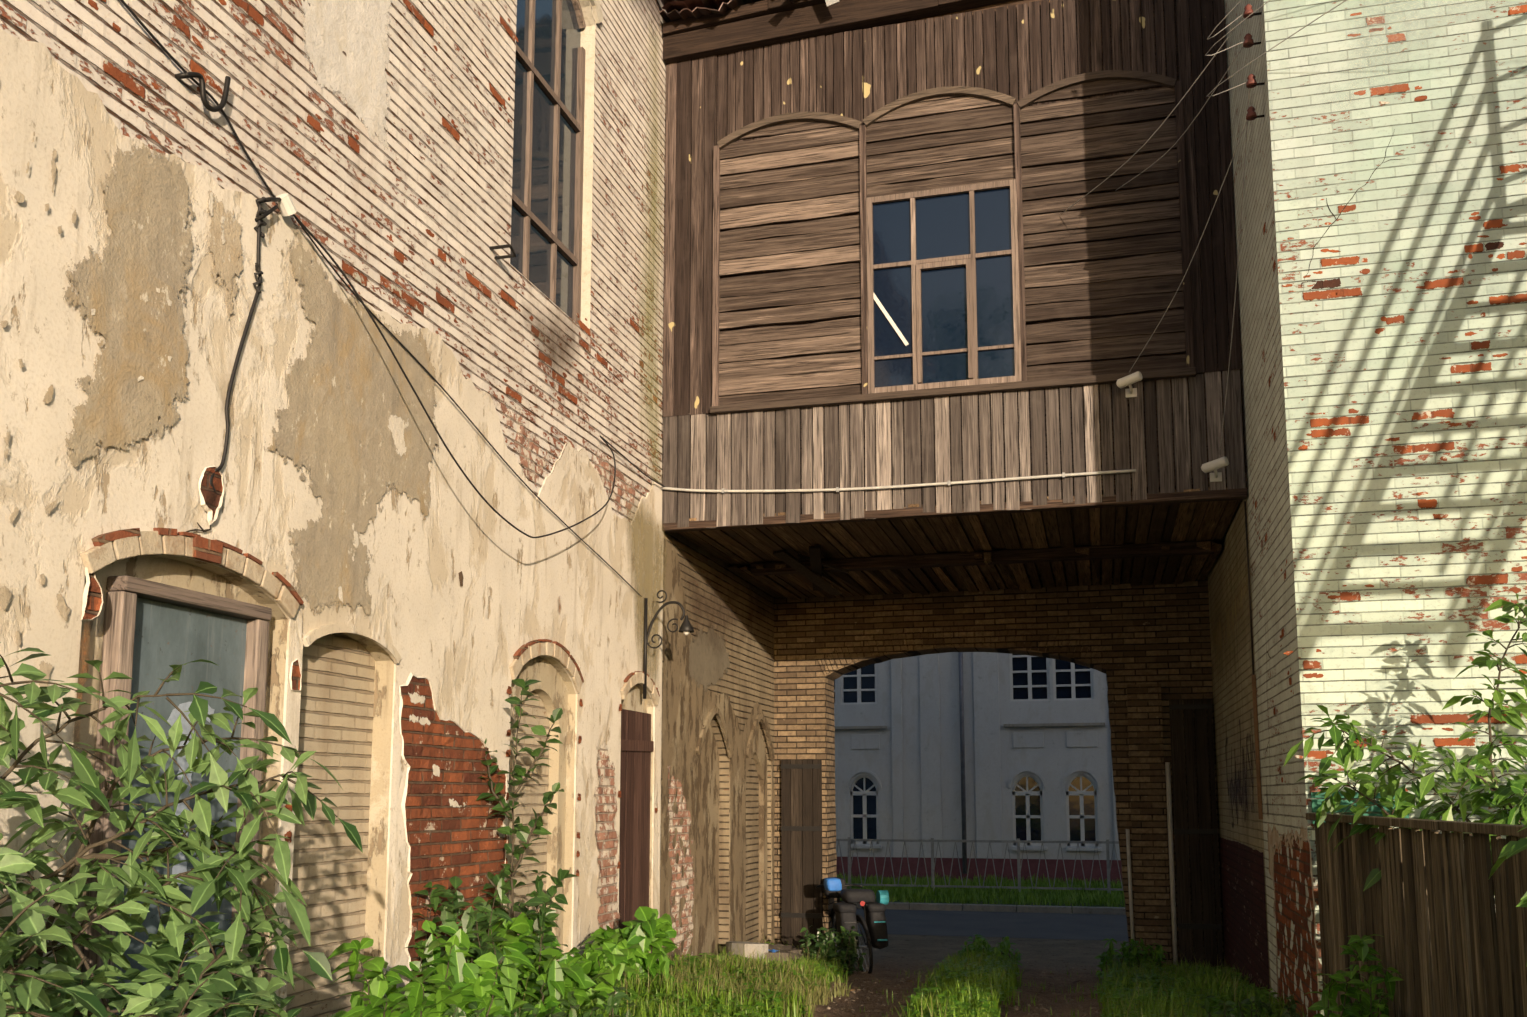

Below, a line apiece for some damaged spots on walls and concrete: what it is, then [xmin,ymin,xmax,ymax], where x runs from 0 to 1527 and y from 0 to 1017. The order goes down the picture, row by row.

spalling [1354,83,1427,105]
peeling [62,143,245,468]
spalling [387,229,612,413]
spalling [1272,249,1370,301]
spalling [1416,212,1527,383]
peeling [92,226,458,615]
spalling [1298,408,1369,451]
spalling [1385,408,1462,461]
spalling [1452,556,1527,594]
spalling [513,639,584,707]
flaking render [399,672,511,993]
flaking render [1272,832,1322,1017]